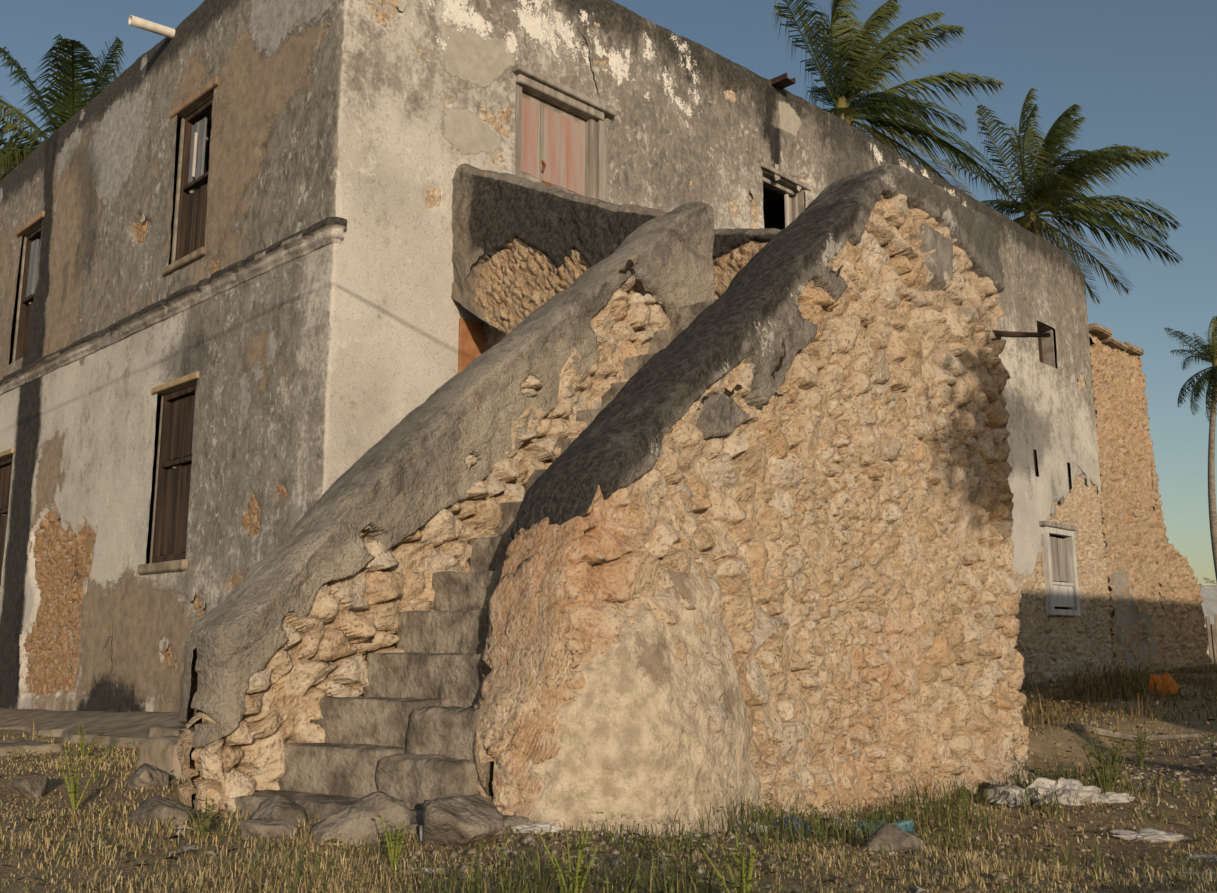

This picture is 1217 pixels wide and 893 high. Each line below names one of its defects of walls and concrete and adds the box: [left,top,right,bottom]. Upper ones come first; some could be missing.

peeling [368,0,703,122]
leakage [0,131,57,709]
peeling [23,431,206,706]
flaking render [1014,472,1117,683]